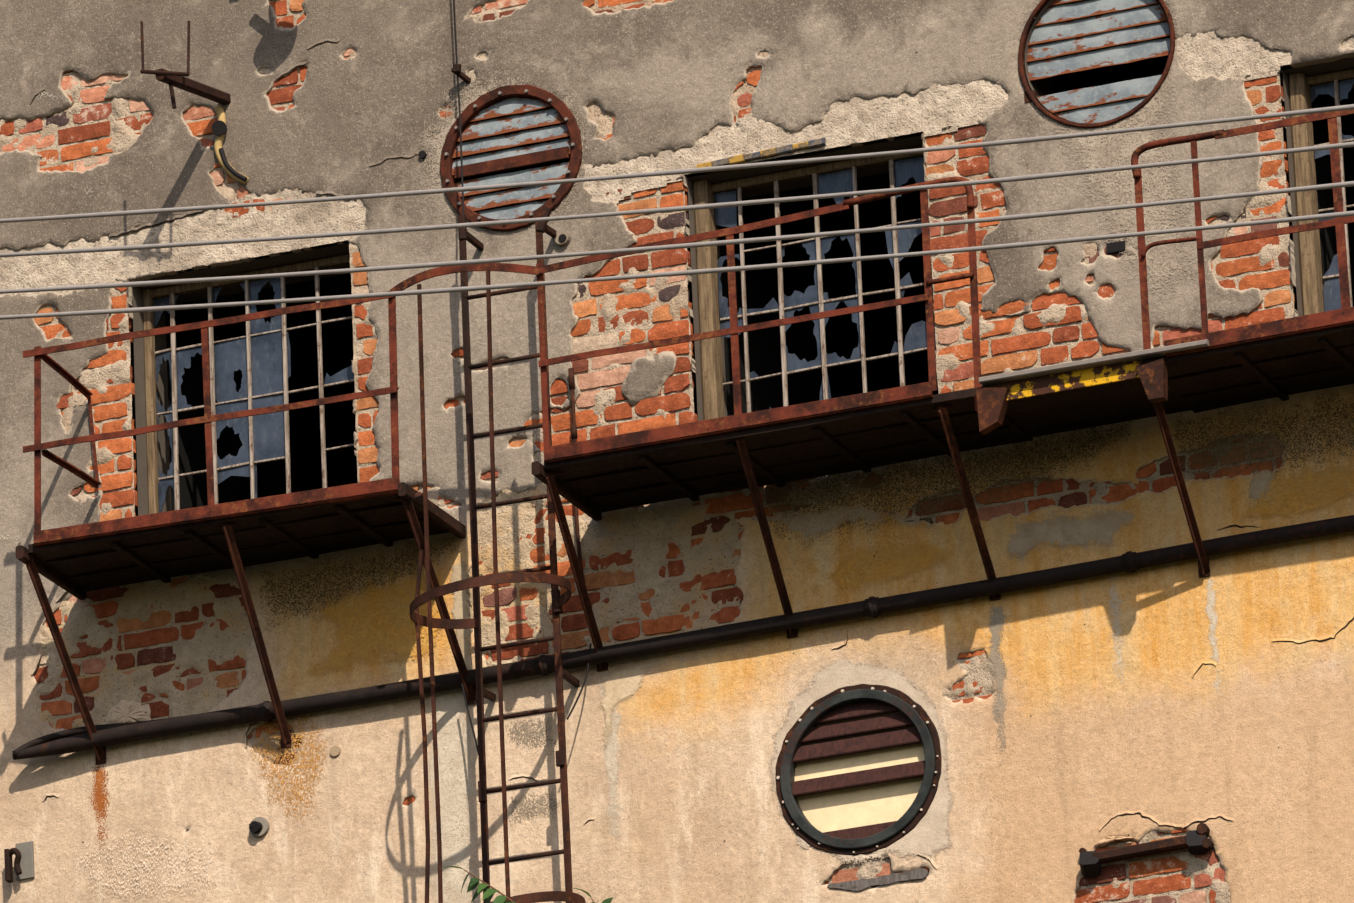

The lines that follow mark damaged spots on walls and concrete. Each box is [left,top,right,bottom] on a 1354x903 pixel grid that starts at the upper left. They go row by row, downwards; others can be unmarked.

flaking render [0,70,154,172]
flaking render [509,51,1136,462]
flaking render [0,163,380,521]
flaking render [905,434,1284,524]
flaking render [306,465,887,678]
flaking render [34,576,254,729]
flaking render [942,650,993,703]
crack [1272,613,1354,644]
corrosion [88,764,110,852]
corrosion [250,713,328,829]
flaking render [824,855,903,888]
flaking render [1074,828,1231,903]